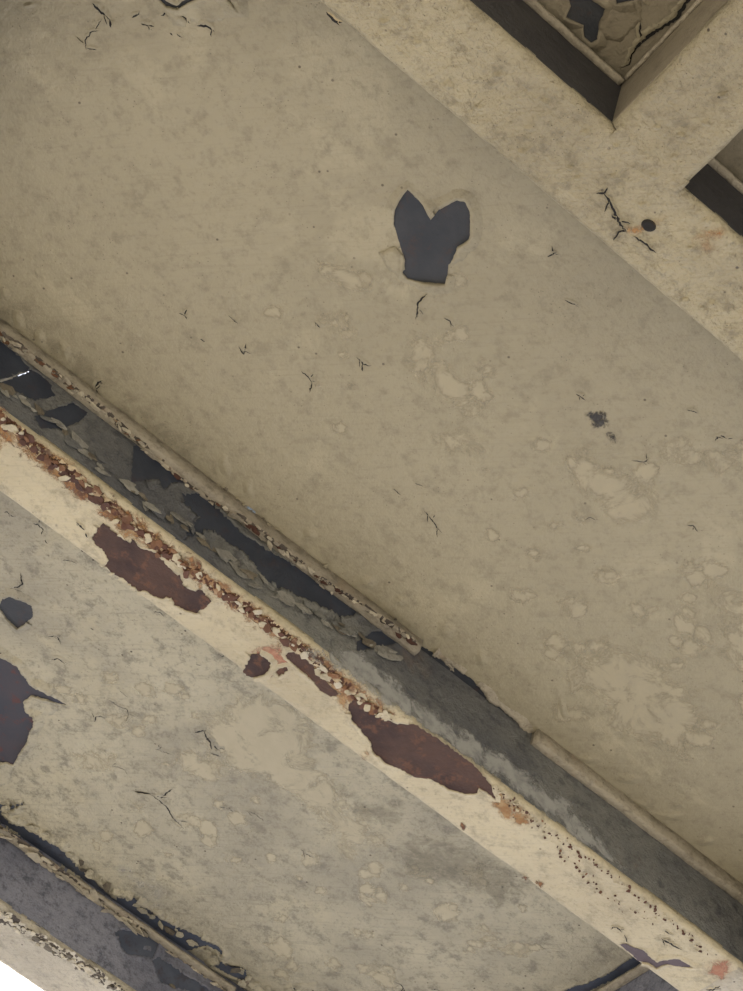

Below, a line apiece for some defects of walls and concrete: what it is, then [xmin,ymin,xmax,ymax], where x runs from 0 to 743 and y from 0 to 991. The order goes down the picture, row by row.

crack [76,2,216,50]
peeling [557,0,651,53]
crack [621,0,691,68]
peeling [379,181,483,294]
leakage [410,327,495,417]
corrosion [0,422,88,500]
leakage [567,438,743,521]
corrosion [98,500,395,715]
peeling [0,329,534,803]
leakage [543,561,743,760]